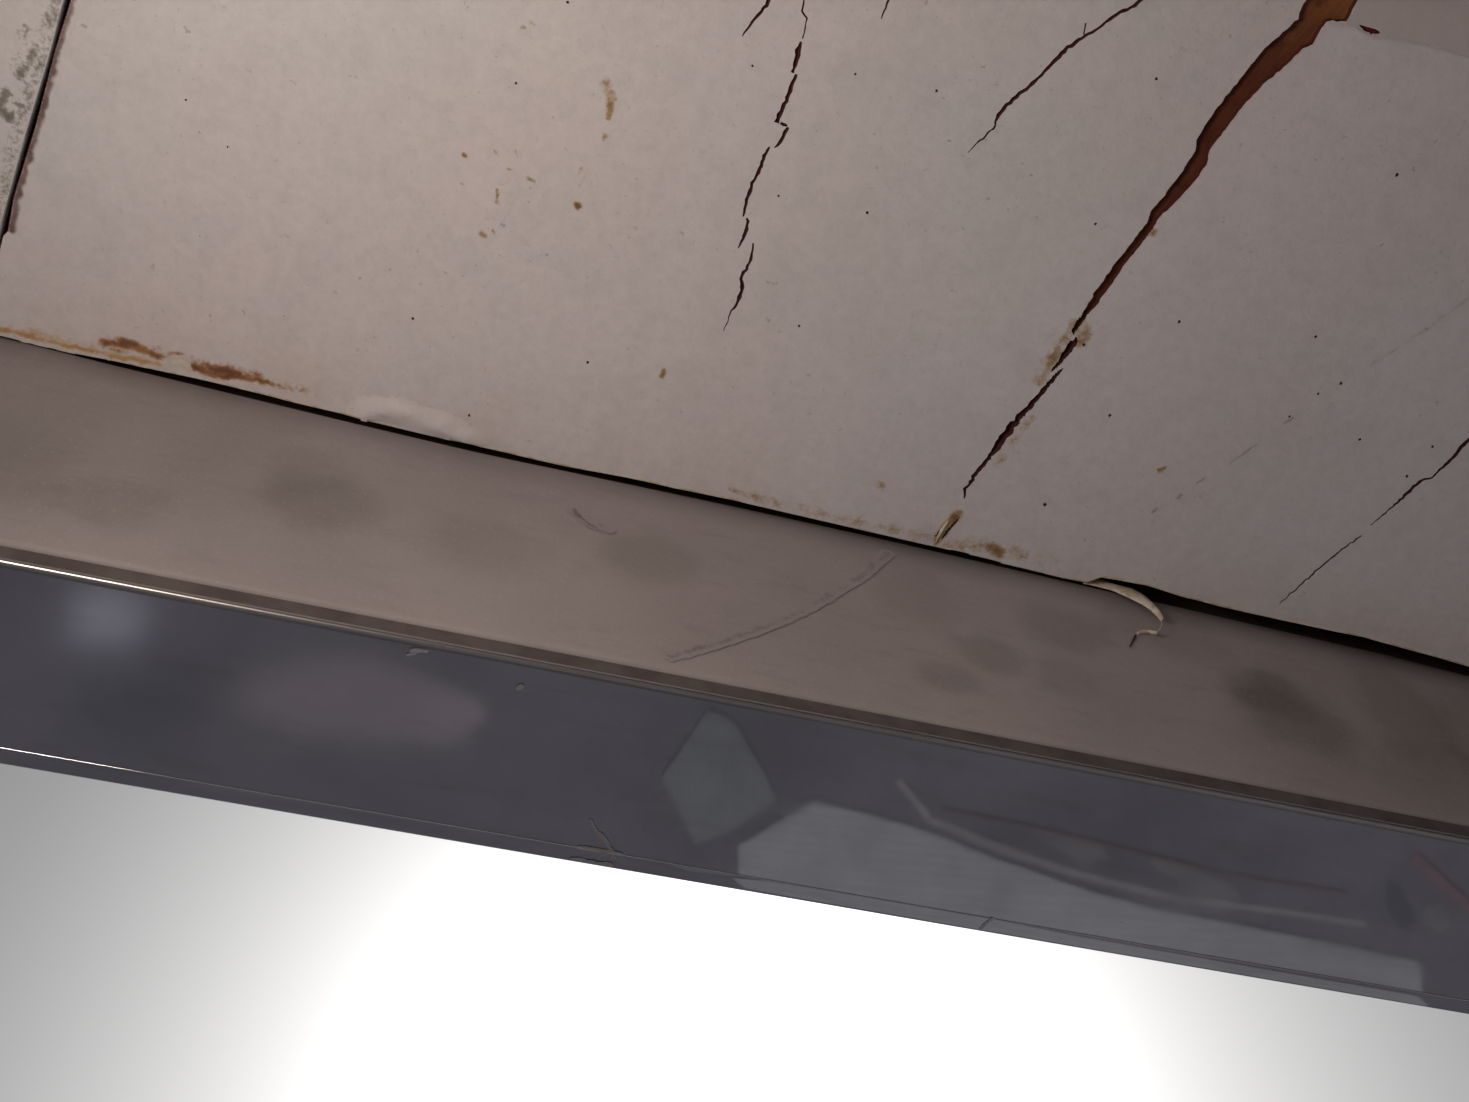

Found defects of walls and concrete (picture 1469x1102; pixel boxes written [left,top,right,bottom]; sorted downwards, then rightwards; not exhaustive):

crack [723,0,808,331]
crack [935,0,1358,542]
rust [1146,225,1162,240]
rust [0,319,319,398]
crack [1280,438,1469,603]
peeling [1083,578,1164,647]